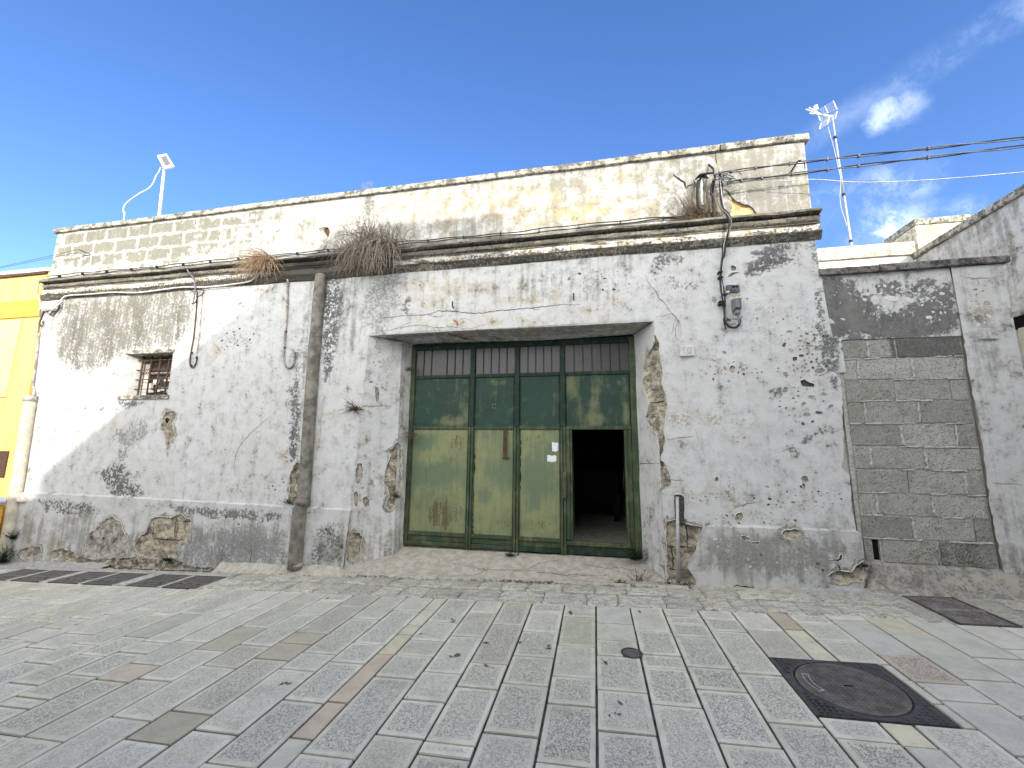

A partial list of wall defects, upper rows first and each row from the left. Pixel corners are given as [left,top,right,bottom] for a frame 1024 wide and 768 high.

leakage [57,290,192,371]
leakage [322,279,344,382]
crack [371,304,580,340]
leakage [100,420,149,497]
spalling [148,387,186,457]
spalling [226,461,300,505]
spalling [353,439,405,513]
spalling [642,336,672,489]
spalling [17,505,214,571]
spalling [320,524,366,563]
spalling [659,475,868,587]